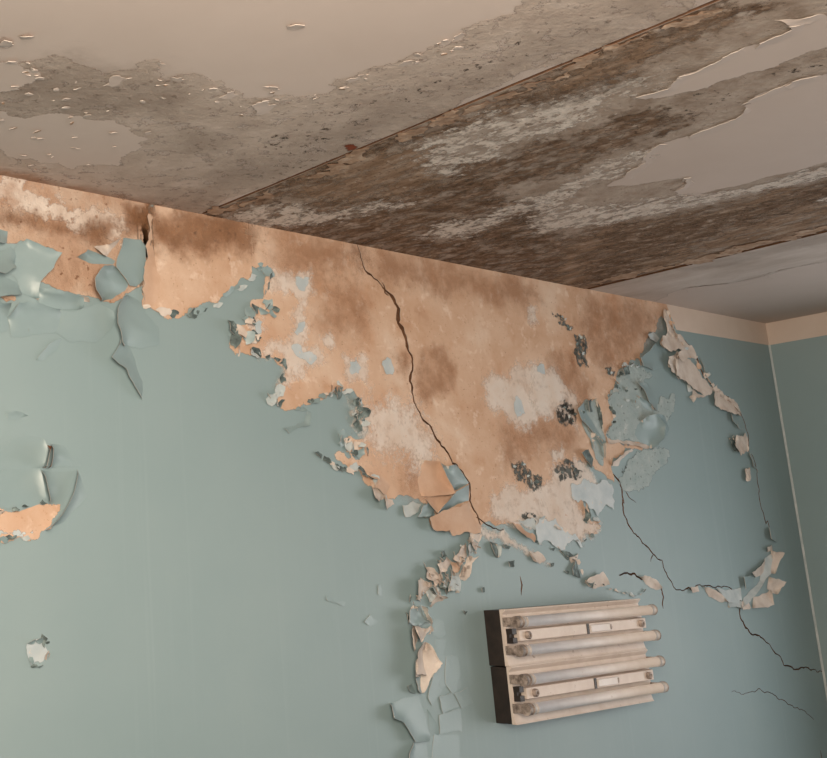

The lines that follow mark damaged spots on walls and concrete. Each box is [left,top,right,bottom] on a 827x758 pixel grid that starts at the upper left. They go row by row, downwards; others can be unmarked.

damp [0,0,827,289]
peeling [0,0,827,578]
crack [357,245,504,531]
peeling [26,634,50,668]
peeling [390,605,473,758]
peeling [416,543,479,607]
peeling [584,572,663,597]
crack [613,474,822,672]
peeling [691,528,786,610]
crack [732,688,814,720]